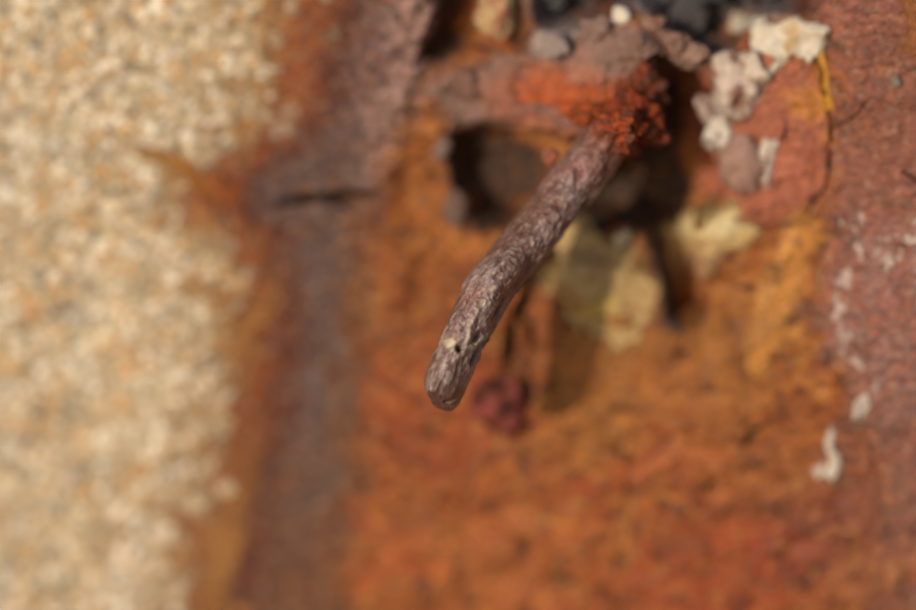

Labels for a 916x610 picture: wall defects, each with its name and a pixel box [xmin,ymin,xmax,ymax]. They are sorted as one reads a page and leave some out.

rust [140,0,443,610]
spalling [342,0,846,383]
rust [563,100,673,156]
rust [612,59,671,109]
rust [806,0,916,221]
rust [329,334,916,610]